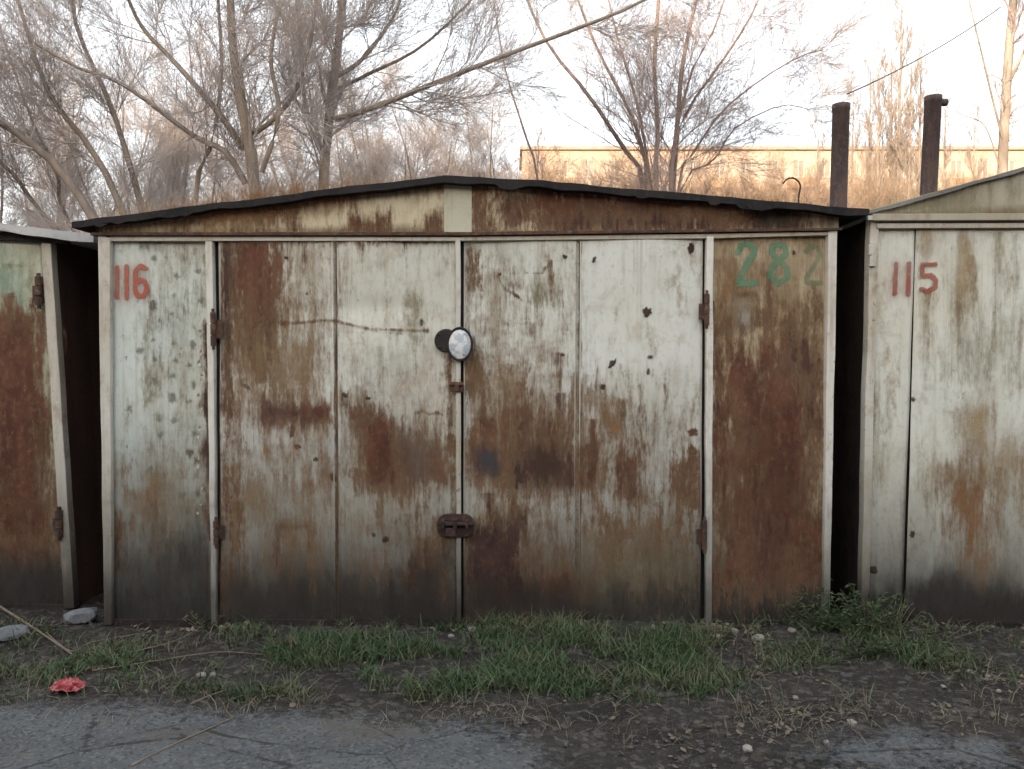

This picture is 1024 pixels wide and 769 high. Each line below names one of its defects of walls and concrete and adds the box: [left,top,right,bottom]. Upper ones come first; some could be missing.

corrosion [472,175,821,244]
corrosion [0,293,73,552]
corrosion [96,177,656,622]
corrosion [669,256,824,614]
corrosion [935,463,1001,591]